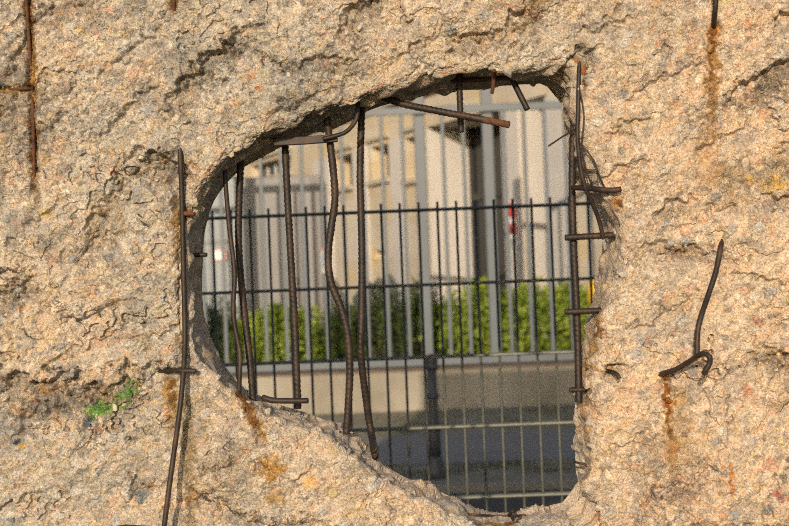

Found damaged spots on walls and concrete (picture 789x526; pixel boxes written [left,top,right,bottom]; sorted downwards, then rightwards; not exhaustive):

rust [0,0,39,191]
spalling [381,2,543,133]
rust [704,21,722,118]
spalling [564,45,625,403]
spalling [214,101,379,460]
rust [162,378,177,421]
rust [236,391,266,437]
rust [661,375,679,457]
rust [252,456,288,504]